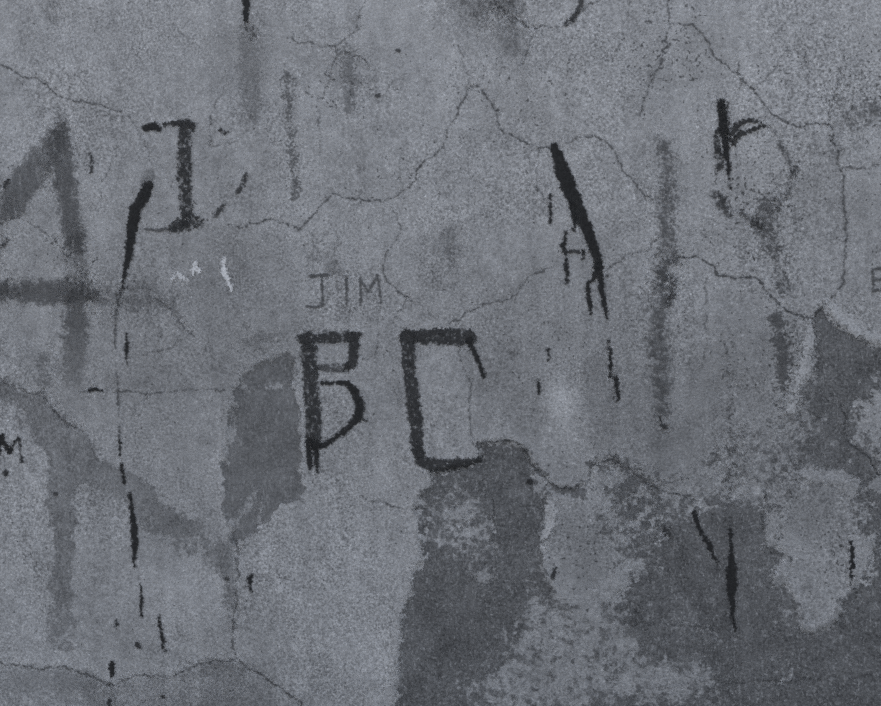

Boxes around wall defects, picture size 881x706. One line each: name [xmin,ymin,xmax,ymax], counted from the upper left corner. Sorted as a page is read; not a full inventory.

crack [0,64,121,112]
crack [237,85,549,295]
crack [569,135,654,200]
crack [639,0,878,319]
crack [441,269,545,329]
damp [0,378,241,651]
crack [458,346,696,501]
peeling [361,299,881,706]
crack [841,409,881,476]
crack [0,544,303,705]